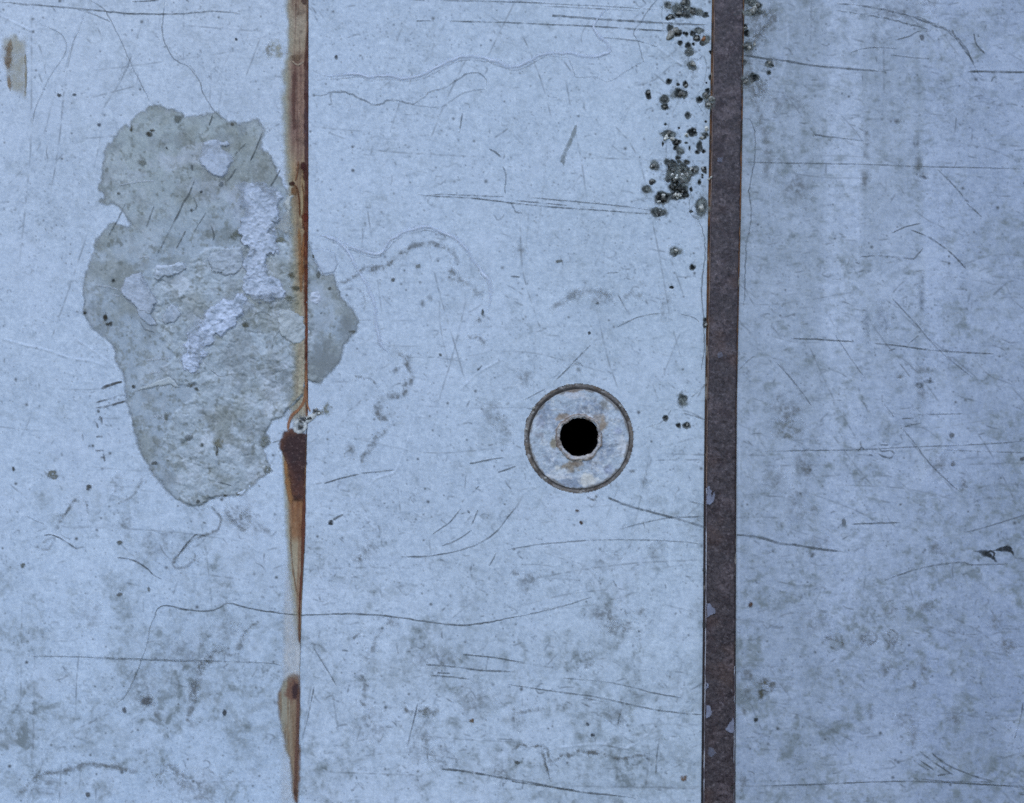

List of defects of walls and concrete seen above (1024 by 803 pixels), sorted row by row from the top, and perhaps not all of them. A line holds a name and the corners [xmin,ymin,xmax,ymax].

corrosion [6,38,27,94]
peeling [83,105,359,506]
corrosion [280,0,310,643]
corrosion [278,675,300,802]